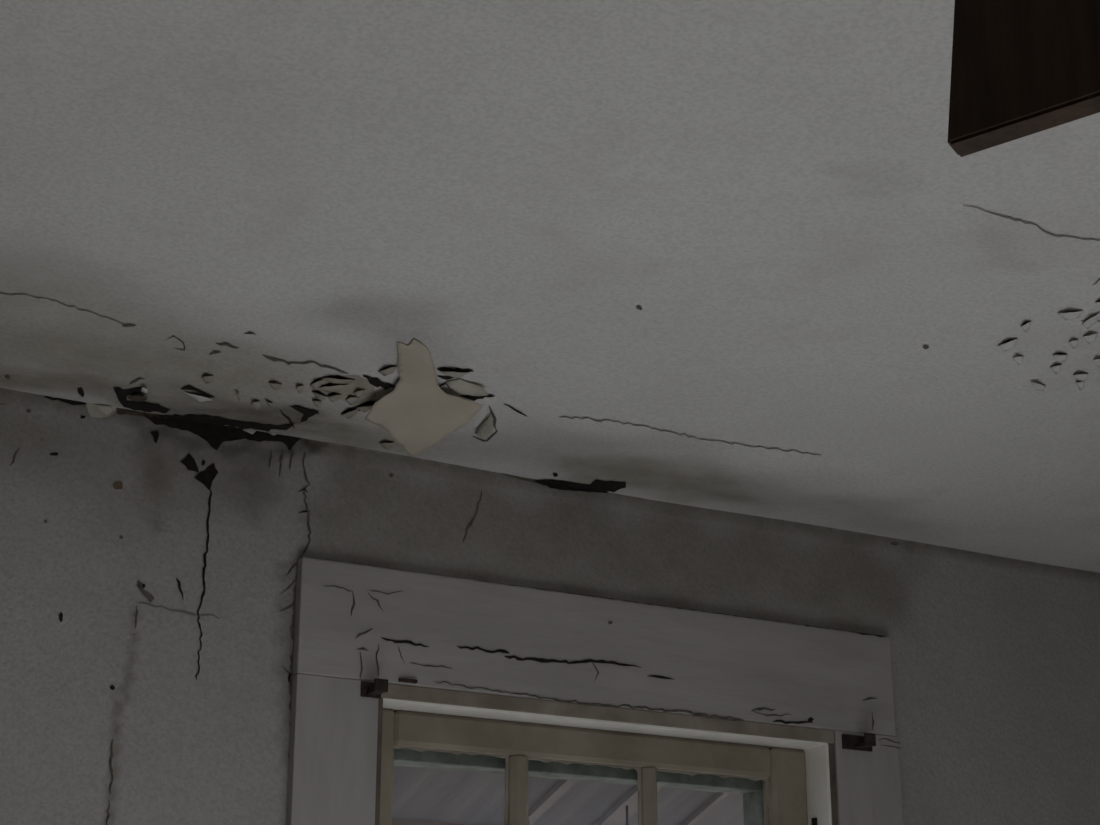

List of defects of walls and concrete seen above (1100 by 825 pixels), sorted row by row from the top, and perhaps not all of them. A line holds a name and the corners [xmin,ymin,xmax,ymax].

crack [964,205,1100,241]
flaking render [43,378,171,419]
peeling [263,355,397,419]
peeling [437,367,497,442]
water stain [180,454,218,491]
water stain [116,406,319,476]
water stain [502,473,626,493]
crack [137,489,219,680]